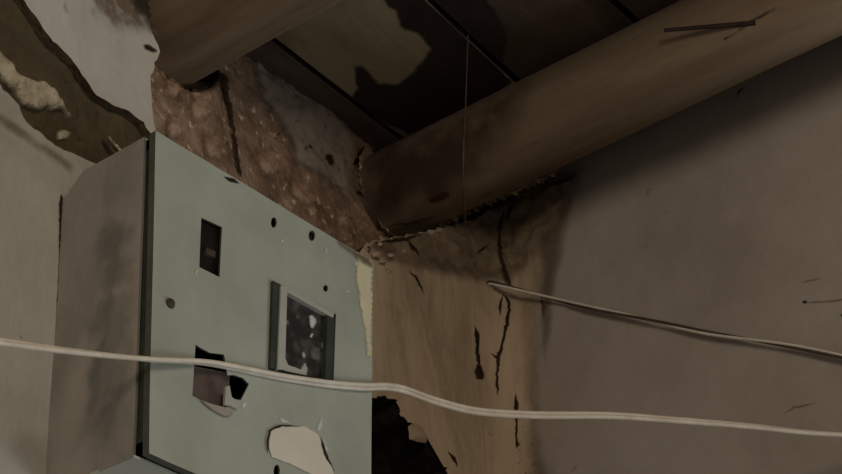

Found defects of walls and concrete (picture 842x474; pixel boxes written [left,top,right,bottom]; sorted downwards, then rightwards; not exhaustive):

spalling [0,0,143,164]
crack [199,70,242,178]
crack [474,209,519,447]
spalling [408,423,427,443]